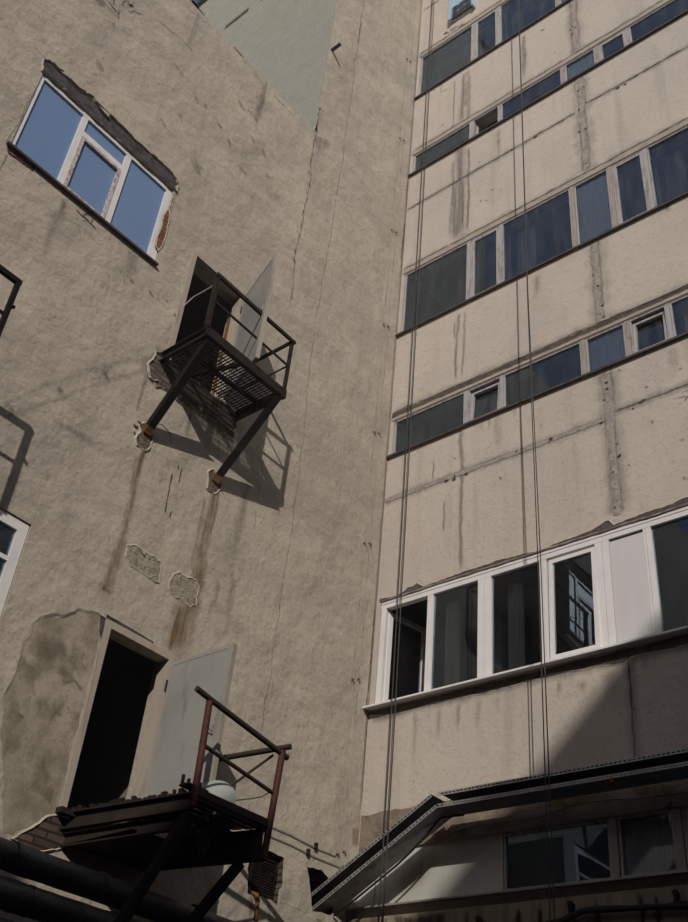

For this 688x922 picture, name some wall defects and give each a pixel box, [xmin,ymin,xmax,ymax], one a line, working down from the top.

spalling [41,58,180,252]
flaking render [146,350,238,443]